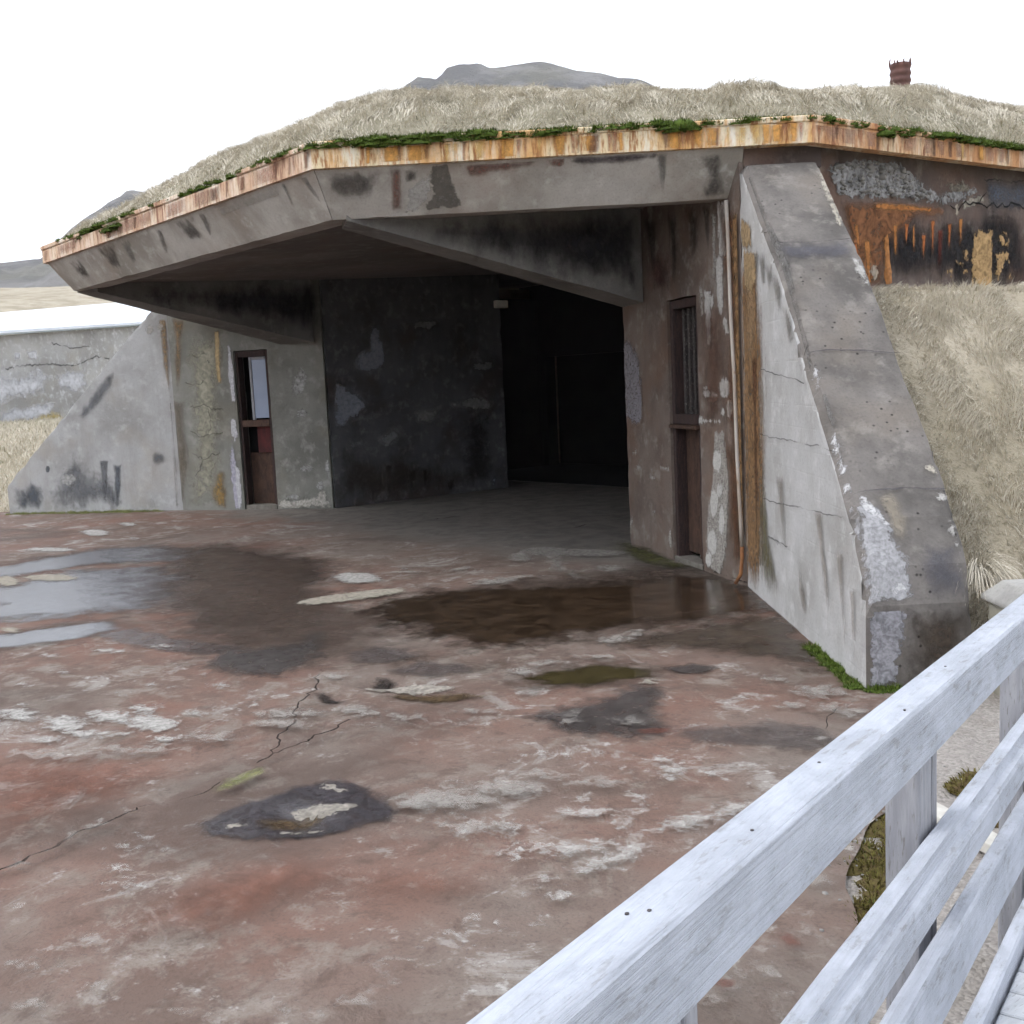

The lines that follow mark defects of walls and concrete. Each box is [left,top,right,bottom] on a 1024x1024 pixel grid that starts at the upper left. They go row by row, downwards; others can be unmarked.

rust [384,144,428,208]
rust [552,132,623,166]
spalling [819,158,984,225]
crack [949,178,1024,211]
spalling [853,258,869,285]
rust [845,204,962,282]
crack [5,342,109,370]
rust [705,210,763,578]
peeling [699,376,731,574]
damp [5,547,465,676]
spalling [850,497,913,686]
crack [257,676,350,763]